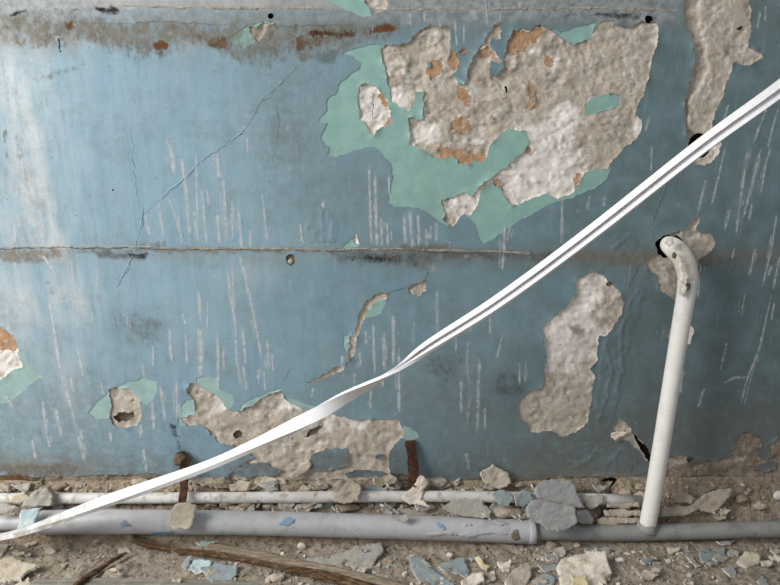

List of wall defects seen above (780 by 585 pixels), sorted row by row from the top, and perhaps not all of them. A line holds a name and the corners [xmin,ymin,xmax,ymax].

corrosion [207,36,227,49]
corrosion [295,29,356,51]
corrosion [370,24,396,34]
spalling [683,0,764,148]
peeling [318,20,659,244]
crack [0,63,530,287]
spalling [645,215,715,302]
peeling [0,327,42,403]
peeling [88,377,157,428]
peeling [178,376,315,447]
peeling [518,271,624,437]
peeling [228,413,419,492]